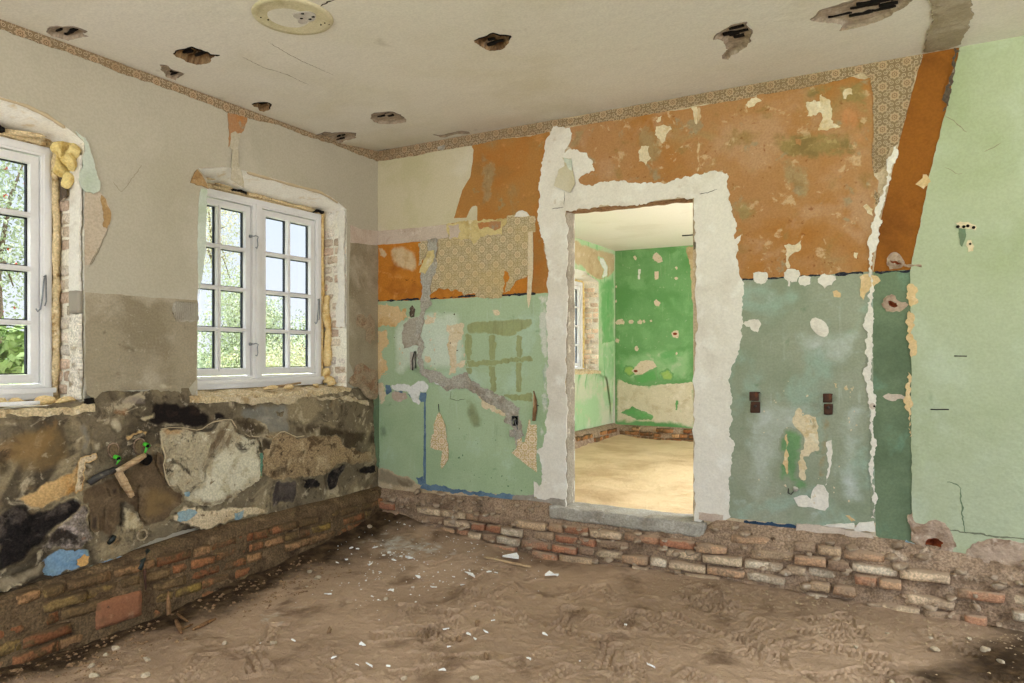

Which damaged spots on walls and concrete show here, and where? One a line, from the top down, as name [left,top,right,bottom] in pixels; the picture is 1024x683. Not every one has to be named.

peeling [568,127,588,149]
peeling [633,120,664,181]
peeling [759,78,873,162]
peeling [731,197,759,235]
peeling [575,239,617,303]
spalling [887,252,922,269]
peeling [882,284,918,357]
peeling [535,293,549,442]
peeling [903,372,913,437]
peeling [17,418,374,552]
spalling [907,514,1024,567]
crack [950,482,1024,540]